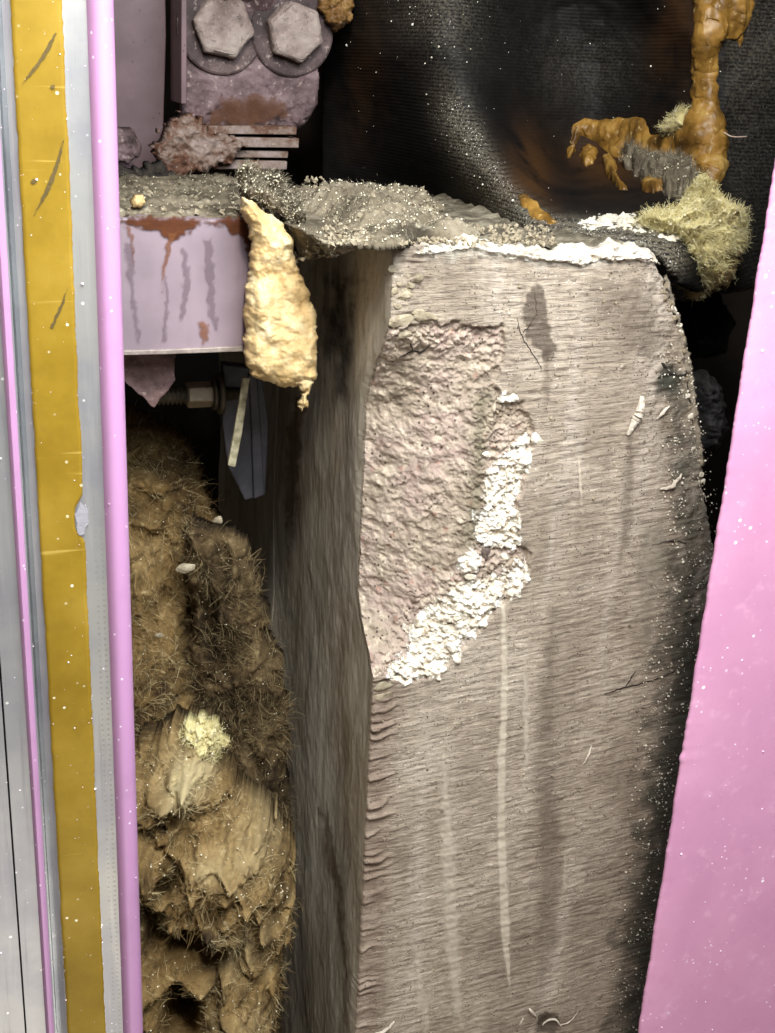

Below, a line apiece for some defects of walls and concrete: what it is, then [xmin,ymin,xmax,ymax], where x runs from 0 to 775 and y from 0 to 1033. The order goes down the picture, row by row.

rust [121,215,251,276]
rust [200,322,208,342]
rust [148,93,287,175]
damp [524,285,556,360]
spalling [416,243,705,488]
spalling [358,265,543,701]
damp [441,779,461,1013]
damp [497,605,511,985]